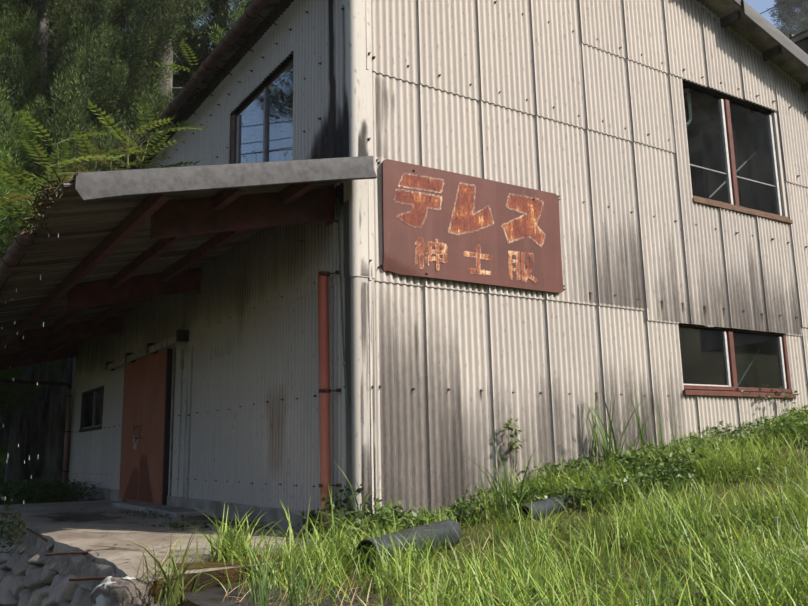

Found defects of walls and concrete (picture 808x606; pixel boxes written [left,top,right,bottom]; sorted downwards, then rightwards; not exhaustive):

damp [311,0,349,159]
damp [359,77,384,157]
damp [343,200,352,495]
damp [361,269,374,345]
damp [589,234,801,335]
damp [361,342,493,538]
damp [538,380,664,482]